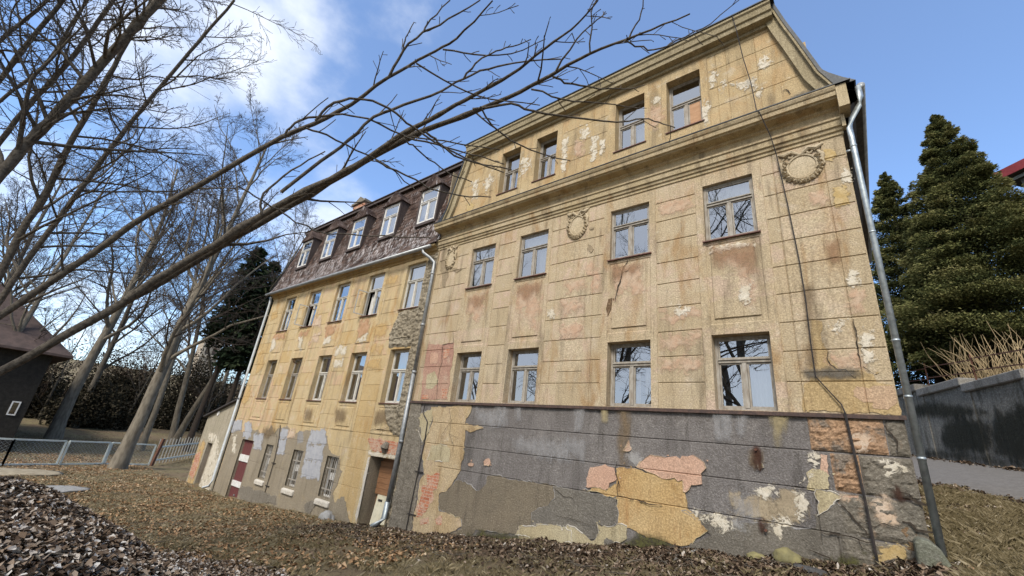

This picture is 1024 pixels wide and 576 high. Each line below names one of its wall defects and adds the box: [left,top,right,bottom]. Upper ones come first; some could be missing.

flaking render [560,124,606,172]
flaking render [809,168,853,208]
flaking render [187,241,917,563]
corrosion [751,446,764,470]